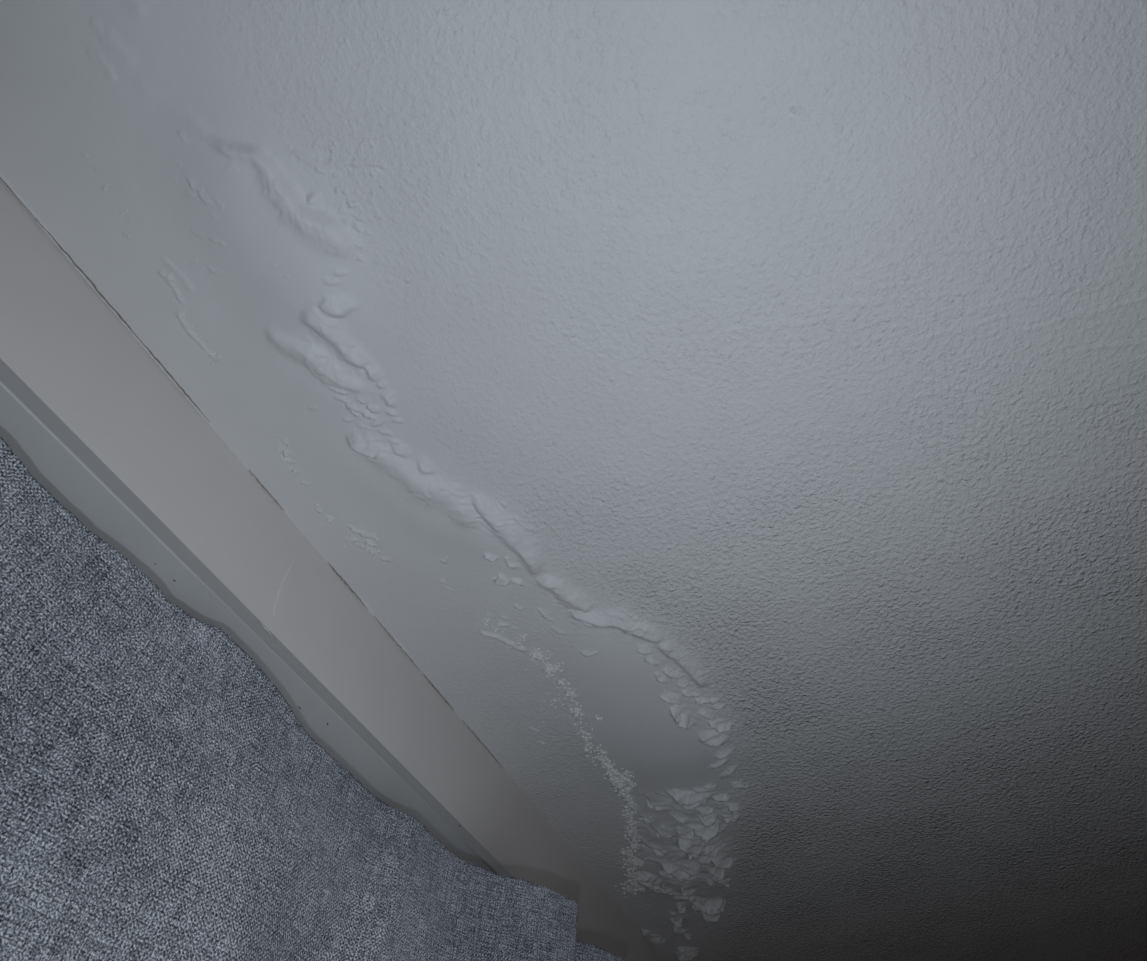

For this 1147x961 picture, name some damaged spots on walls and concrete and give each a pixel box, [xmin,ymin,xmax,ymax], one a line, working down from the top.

peeling [638,902,733,961]